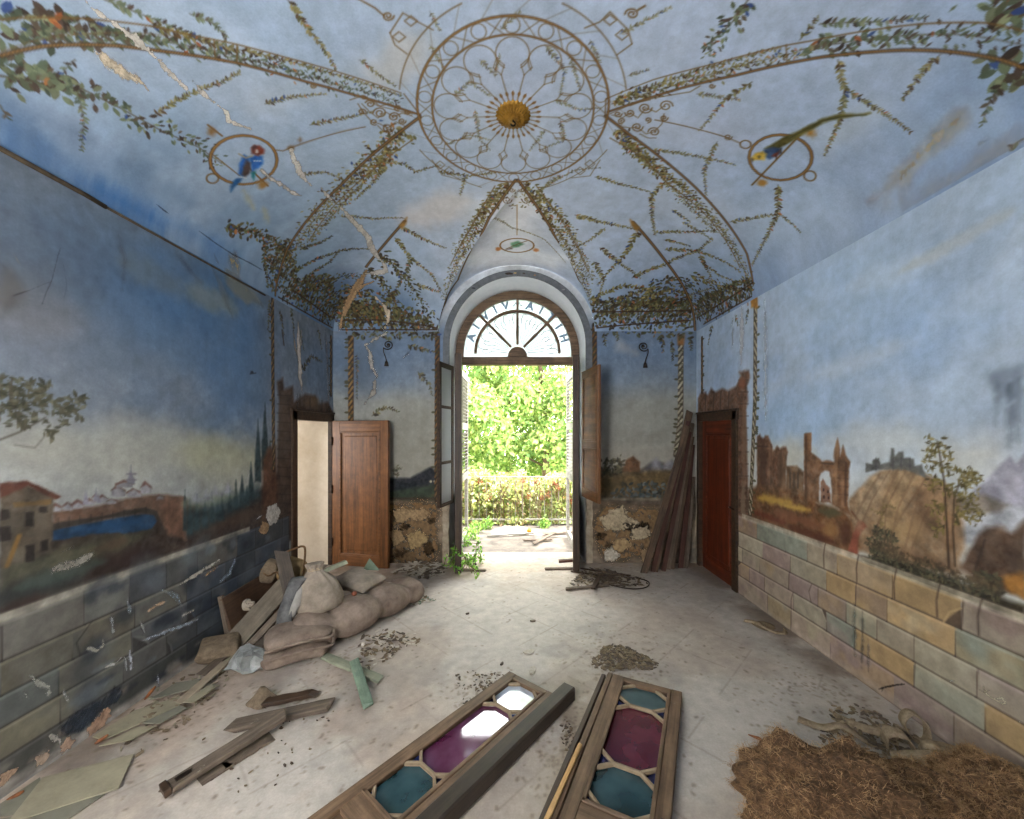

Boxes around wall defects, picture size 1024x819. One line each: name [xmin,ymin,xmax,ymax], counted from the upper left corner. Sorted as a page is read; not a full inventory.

peeling [96,52,149,91]
peeling [338,269,374,329]
flaking render [257,503,281,534]
flaking render [390,500,440,563]
flaking render [593,505,659,562]
peeling [52,553,93,572]